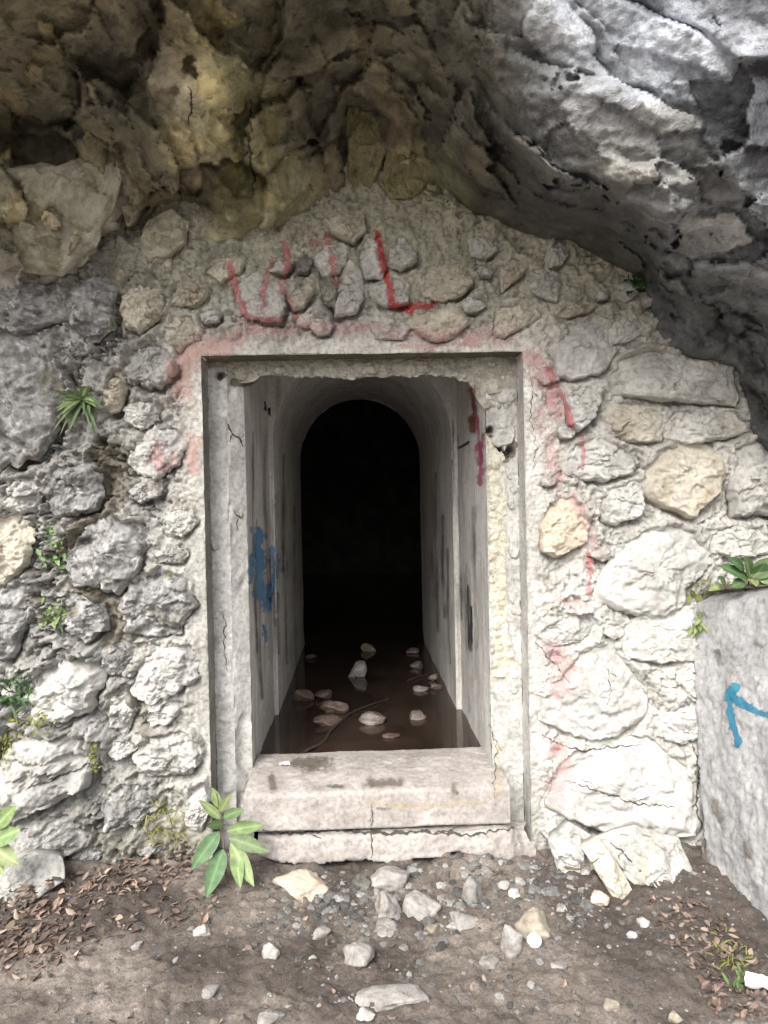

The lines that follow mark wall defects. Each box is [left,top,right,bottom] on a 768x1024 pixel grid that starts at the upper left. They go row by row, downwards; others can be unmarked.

crack [186,87,194,125]
crack [242,99,257,201]
crack [542,734,641,753]
crack [263,804,514,872]
crack [566,744,709,879]